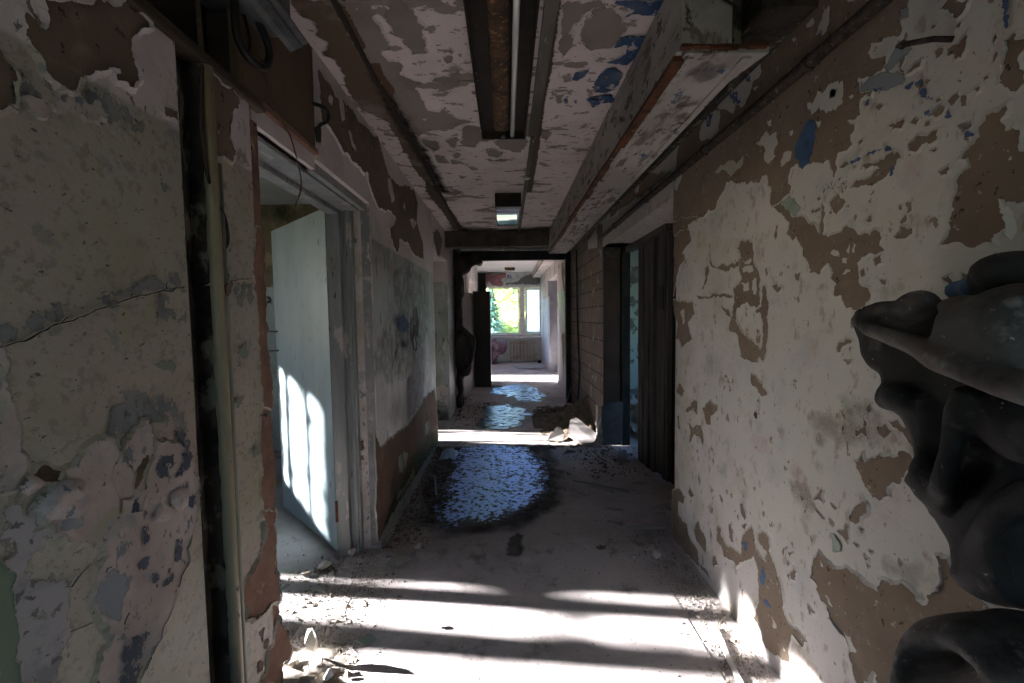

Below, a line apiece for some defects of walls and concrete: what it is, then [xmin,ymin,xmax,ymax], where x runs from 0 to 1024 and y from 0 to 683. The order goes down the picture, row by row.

peeling [0,45,50,121]
peeling [15,0,156,97]
peeling [213,73,241,165]
peeling [315,66,443,261]
peeling [338,0,552,181]
peeling [555,0,629,59]
peeling [673,0,1024,421]
crack [0,274,254,348]
spalling [25,460,68,487]
spalling [243,225,293,683]
peeling [676,383,719,450]
peeling [671,403,1004,683]